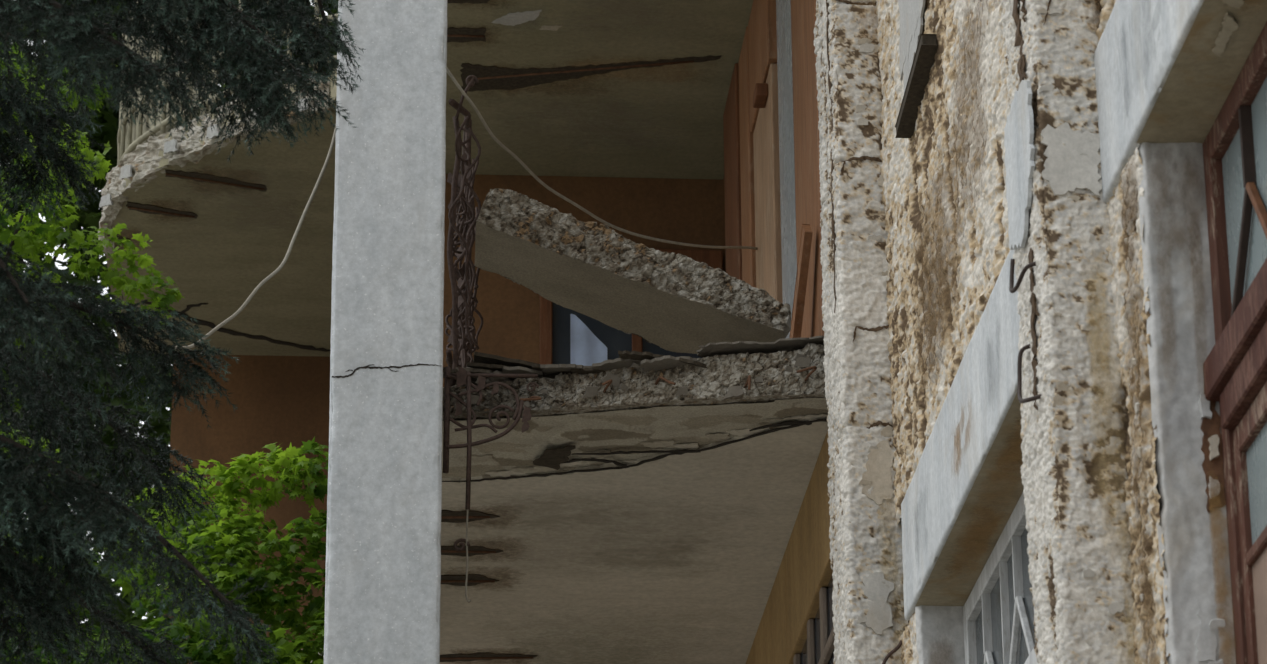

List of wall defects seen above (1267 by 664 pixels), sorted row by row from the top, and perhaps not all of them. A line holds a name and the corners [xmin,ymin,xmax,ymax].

spalling [1212,0,1244,57]
spalling [98,78,334,255]
crack [141,300,439,378]
spalling [440,0,1171,664]
spalling [1198,391,1226,513]
spalling [1196,609,1225,664]